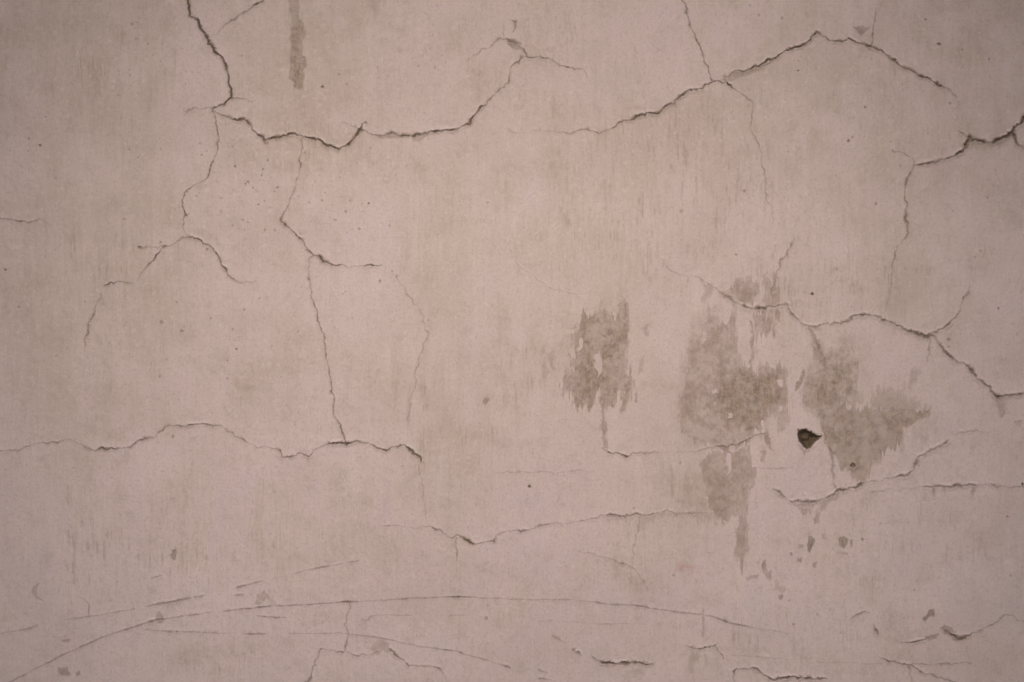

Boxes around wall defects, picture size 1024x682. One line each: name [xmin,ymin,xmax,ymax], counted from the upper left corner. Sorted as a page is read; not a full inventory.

crack [499,0,961,221]
crack [0,0,718,591]
crack [660,114,1024,400]
crack [494,433,765,475]
damp [669,304,712,512]
peeling [683,271,938,602]
crack [753,429,1024,504]
crack [305,603,448,682]
crack [552,635,654,667]
crack [683,644,828,682]
crack [849,611,1024,682]